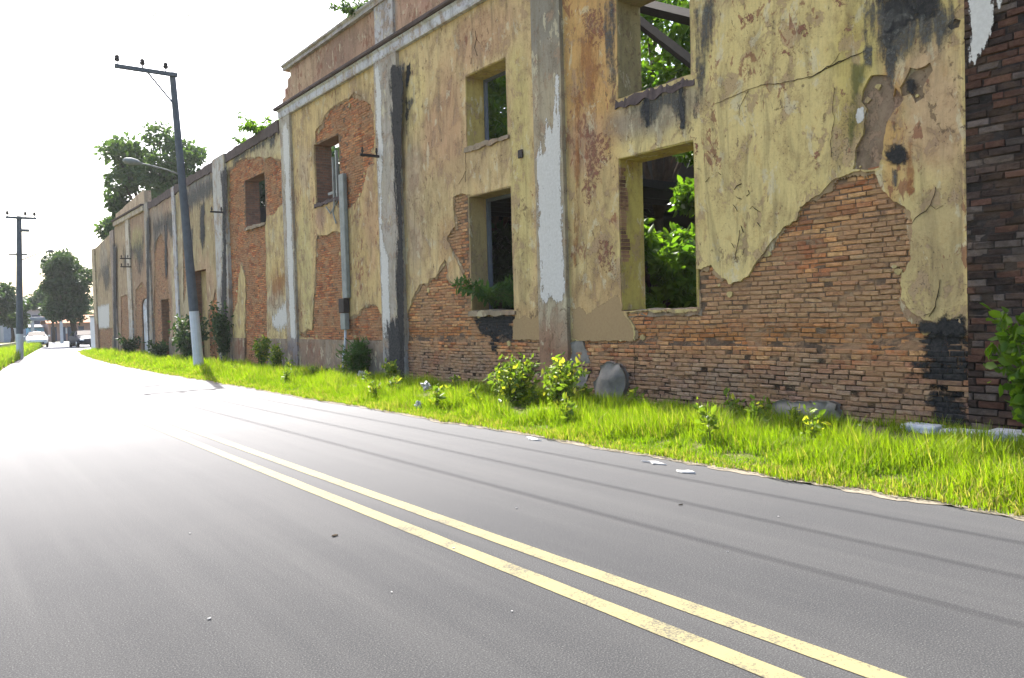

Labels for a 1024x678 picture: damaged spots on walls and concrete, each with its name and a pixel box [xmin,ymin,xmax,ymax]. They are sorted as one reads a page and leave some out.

peeling [99,234,171,352]
peeling [229,66,390,365]
damp [385,62,414,378]
peeling [407,193,541,390]
damp [474,315,515,351]
damp [626,0,714,129]
peeling [537,64,969,428]
crack [715,50,866,156]
damp [885,144,909,186]
damp [849,0,954,143]
damp [909,313,969,428]
peeling [948,0,1003,65]